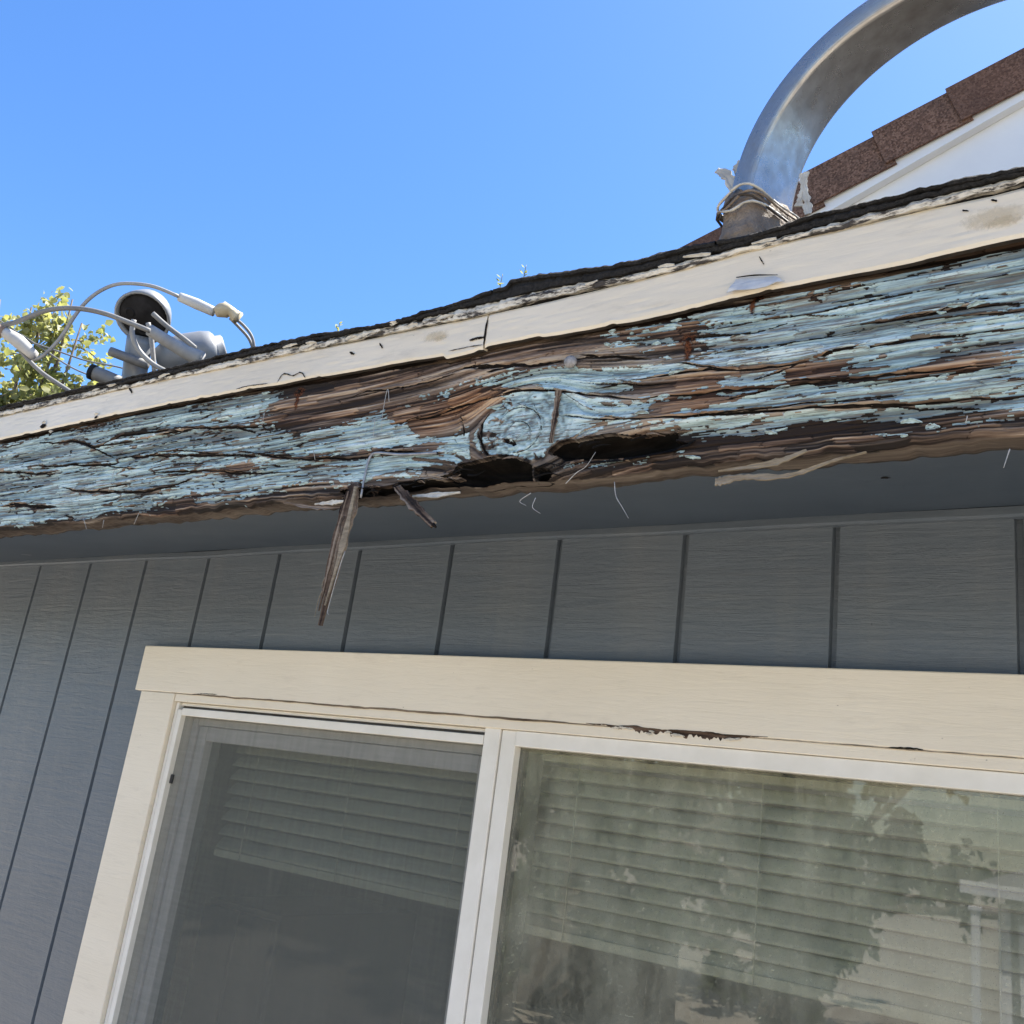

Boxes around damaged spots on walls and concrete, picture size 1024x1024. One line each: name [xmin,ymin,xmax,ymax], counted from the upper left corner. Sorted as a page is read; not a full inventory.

peeling [727,274,785,293]
peeling [870,298,998,323]
peeling [895,346,1024,382]
peeling [143,312,886,517]
peeling [674,395,1024,461]
crack [177,693,600,726]
crack [765,738,1024,759]